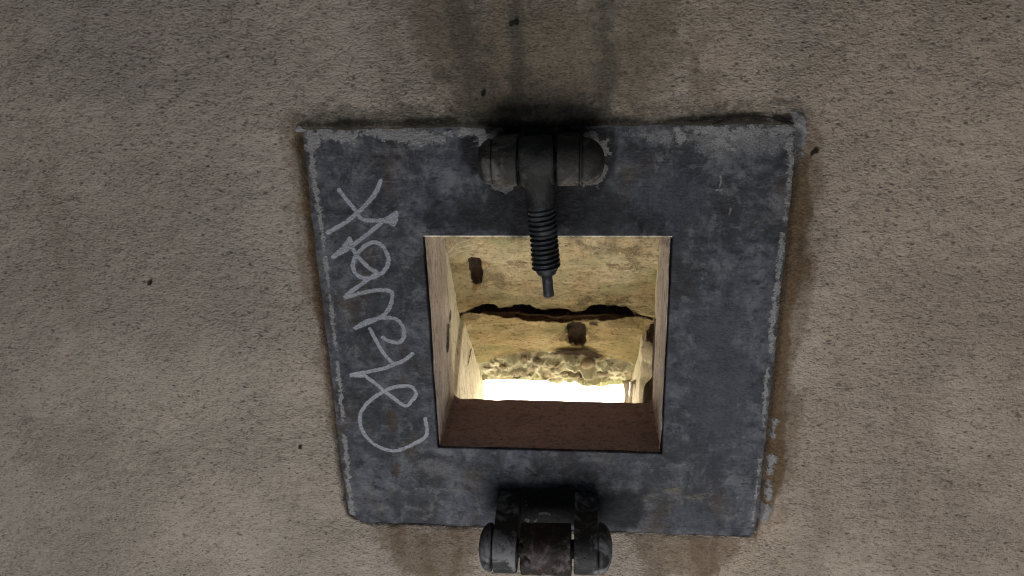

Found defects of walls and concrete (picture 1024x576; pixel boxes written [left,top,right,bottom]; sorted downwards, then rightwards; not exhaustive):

water stain [295,0,809,515]
spalling [478,322,633,386]
crack [459,304,656,403]
water stain [744,453,777,539]